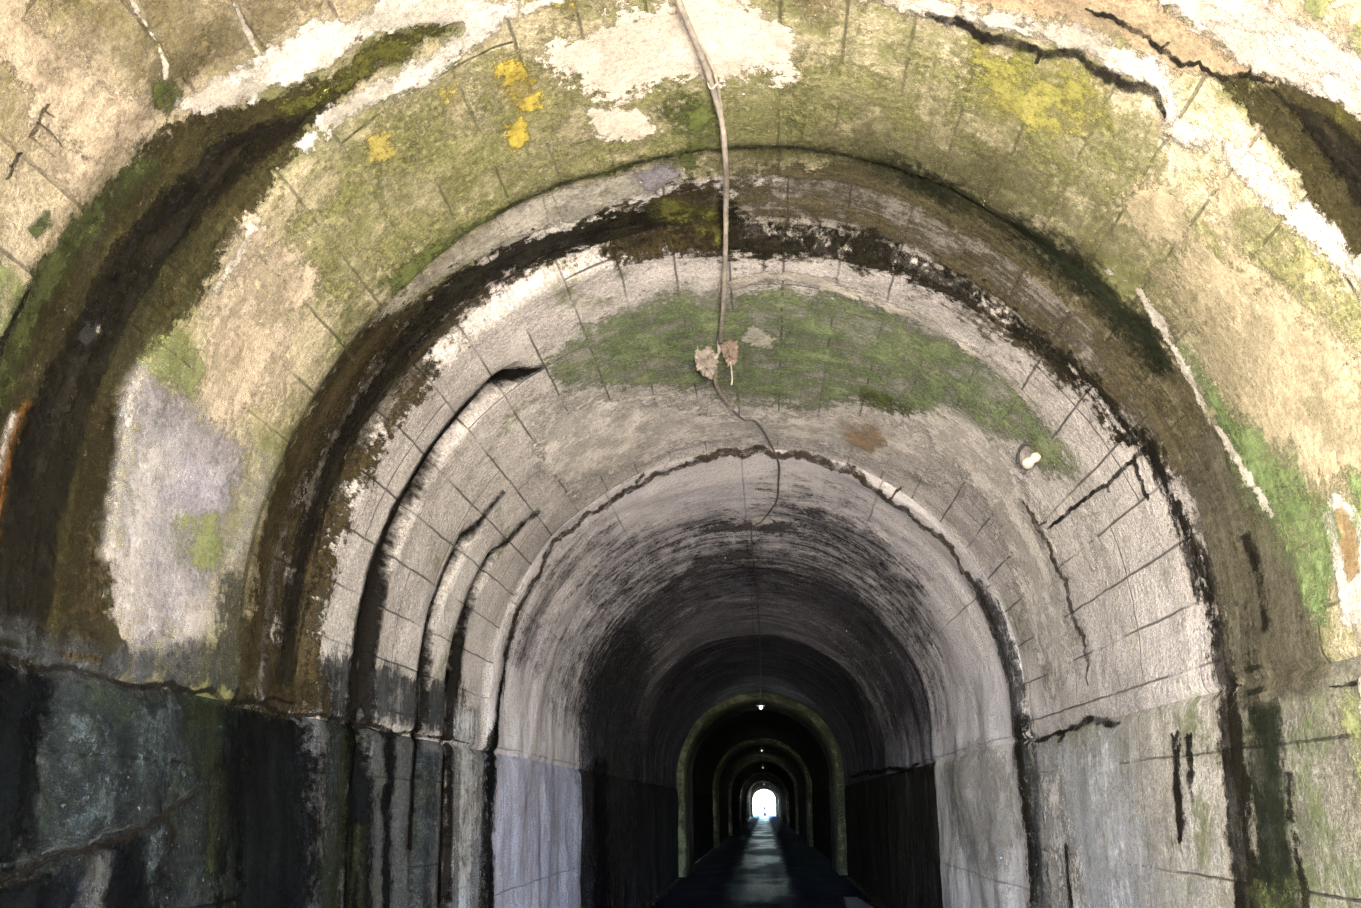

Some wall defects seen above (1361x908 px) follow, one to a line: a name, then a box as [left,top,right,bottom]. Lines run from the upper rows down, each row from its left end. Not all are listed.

peeling [534,0,805,147]
water stain [858,0,1361,303]
peeling [962,0,1264,78]
crack [925,8,1361,171]
rust [0,401,32,533]
water stain [0,0,723,908]
crack [503,445,1011,701]
water stain [528,387,1156,908]
water stain [728,45,1330,908]
crack [1022,445,1169,743]
crack [1330,677,1361,688]